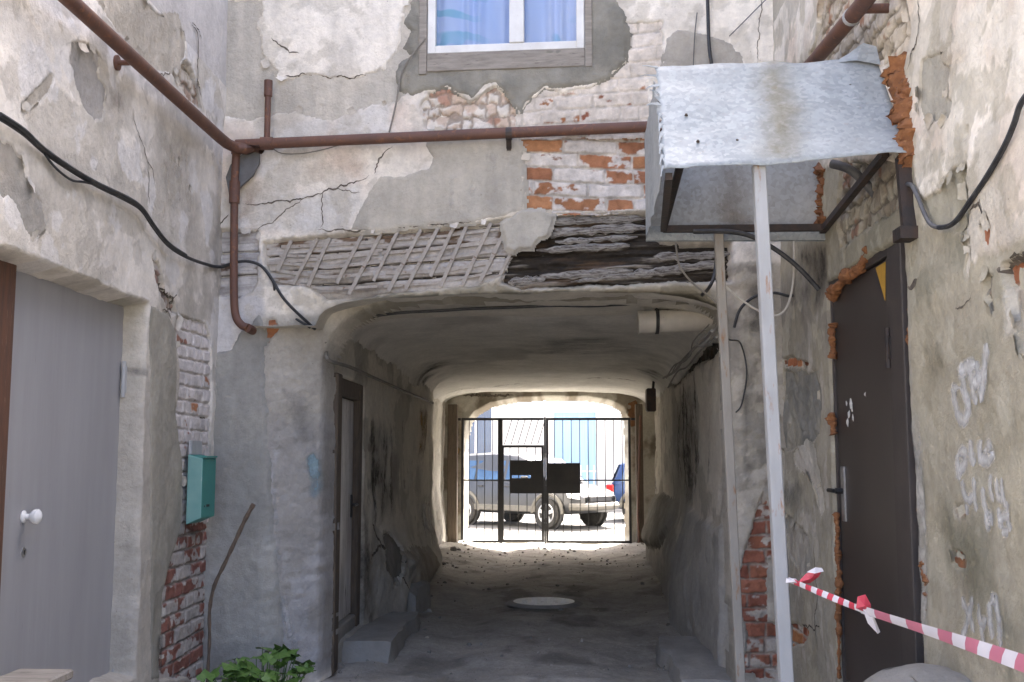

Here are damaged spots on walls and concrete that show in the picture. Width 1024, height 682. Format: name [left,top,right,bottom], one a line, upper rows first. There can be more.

peeling [0,141,46,242]
peeling [21,74,53,113]
peeling [70,42,107,120]
peeling [97,0,200,107]
crack [220,146,393,233]
crack [272,39,366,79]
flaking render [421,22,663,256]
peeling [915,54,952,130]
peeling [918,163,994,316]
flaking render [152,249,211,680]
damp [370,427,392,513]
flaking render [740,494,778,682]